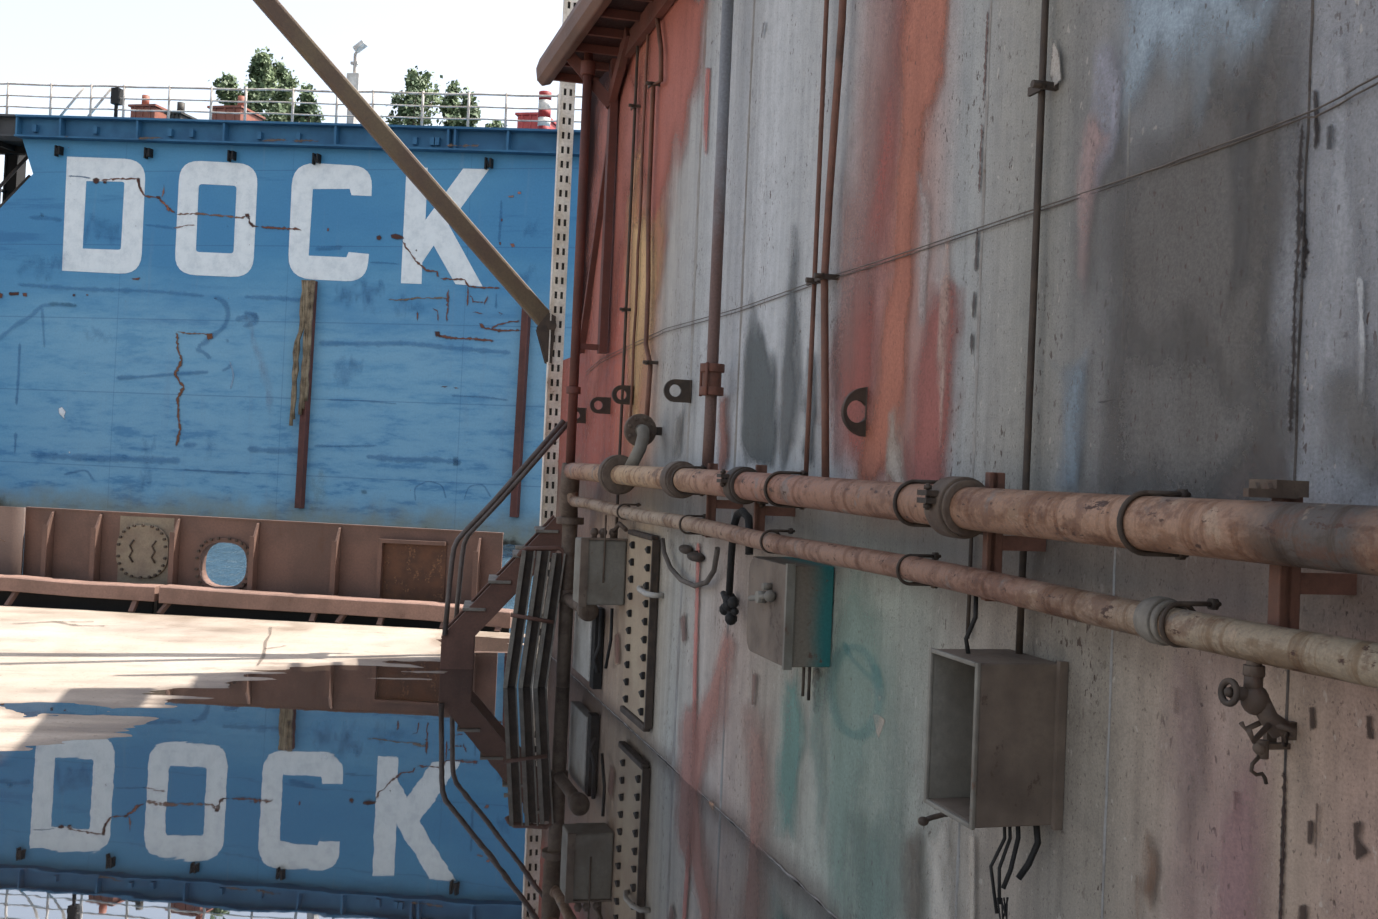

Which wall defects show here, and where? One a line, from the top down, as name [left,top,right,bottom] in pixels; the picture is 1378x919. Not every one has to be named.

corrosion [389,290,520,342]
corrosion [174,332,213,446]